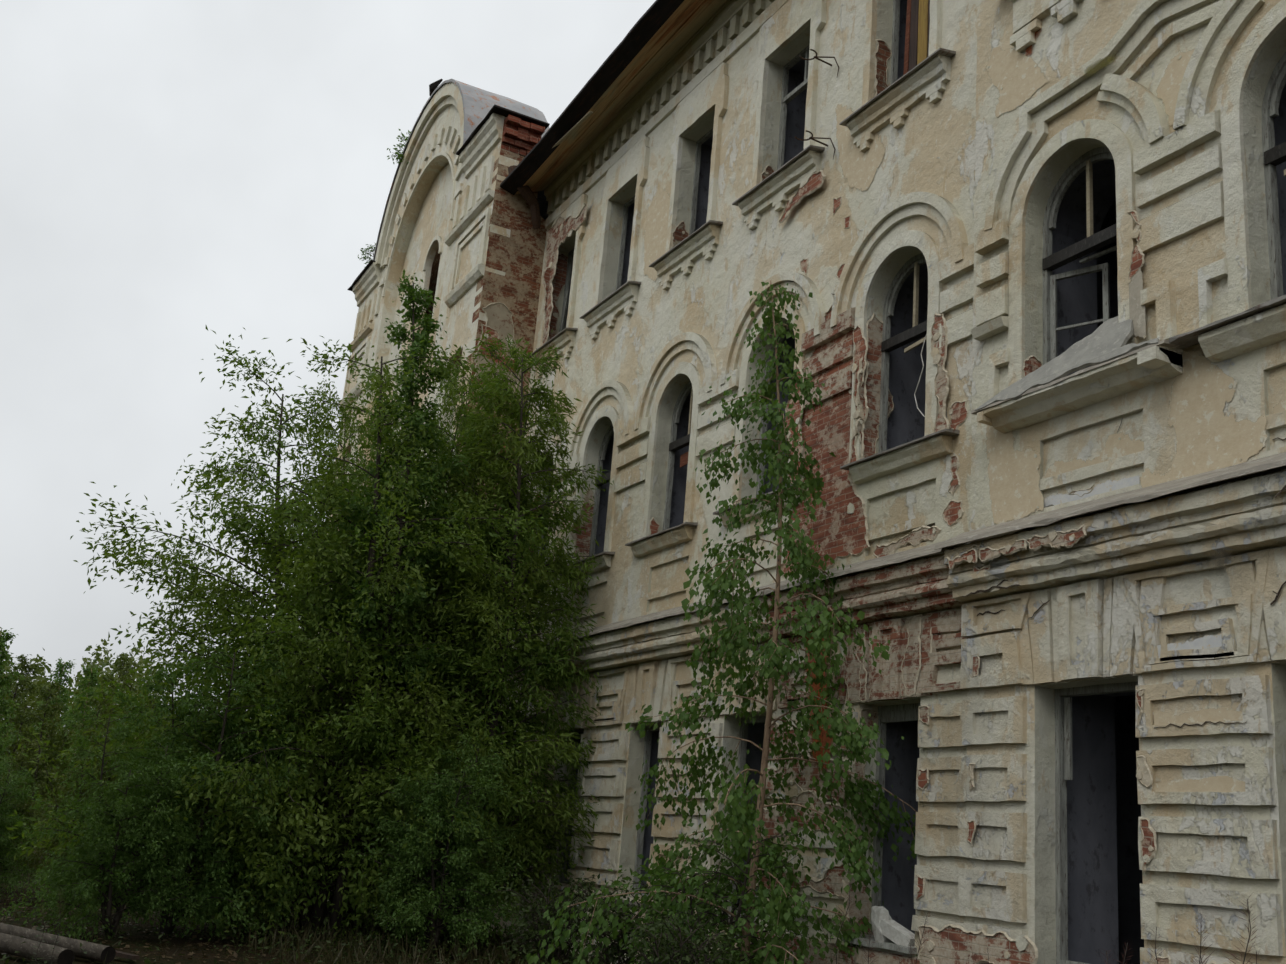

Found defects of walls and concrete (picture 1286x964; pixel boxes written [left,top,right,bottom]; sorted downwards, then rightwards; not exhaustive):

spalling [874,39,892,97]
peeling [833,104,885,229]
spalling [779,170,825,223]
peeling [1127,210,1146,339]
spalling [781,312,968,577]
spalling [946,525,1087,573]
spalling [918,924,1038,964]